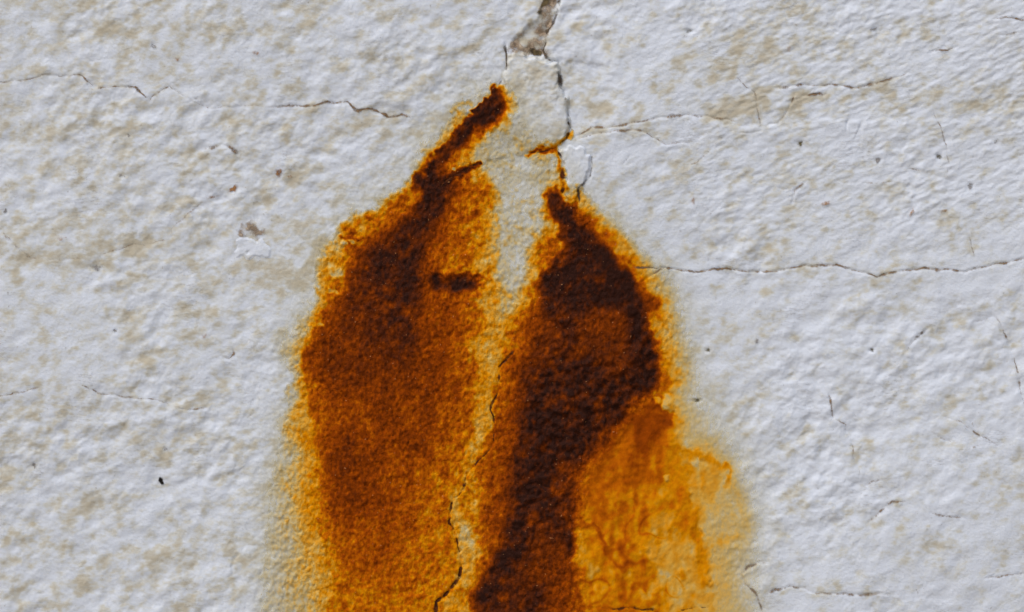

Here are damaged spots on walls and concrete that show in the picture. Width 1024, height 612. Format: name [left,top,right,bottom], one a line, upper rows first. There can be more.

crack [543,0,563,85]
crack [282,100,407,118]
crack [783,78,892,100]
crack [439,164,477,188]
crack [531,115,721,201]
crack [636,252,1019,277]
rust [264,83,756,612]
crack [434,351,513,612]
crack [745,564,873,607]